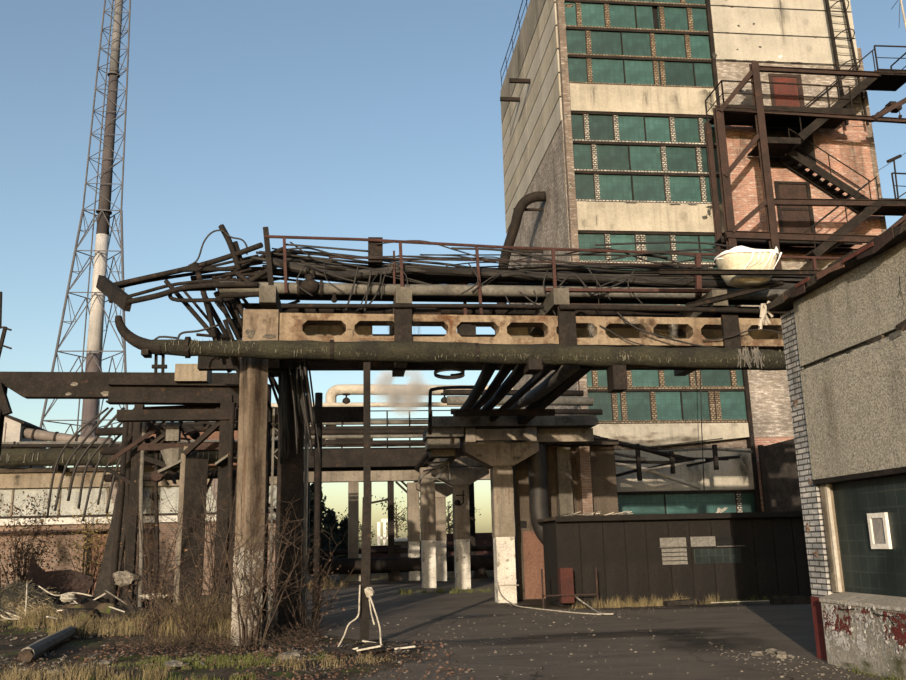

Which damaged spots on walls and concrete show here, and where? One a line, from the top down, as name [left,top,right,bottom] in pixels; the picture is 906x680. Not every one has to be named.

peeling [821,599,906,672]